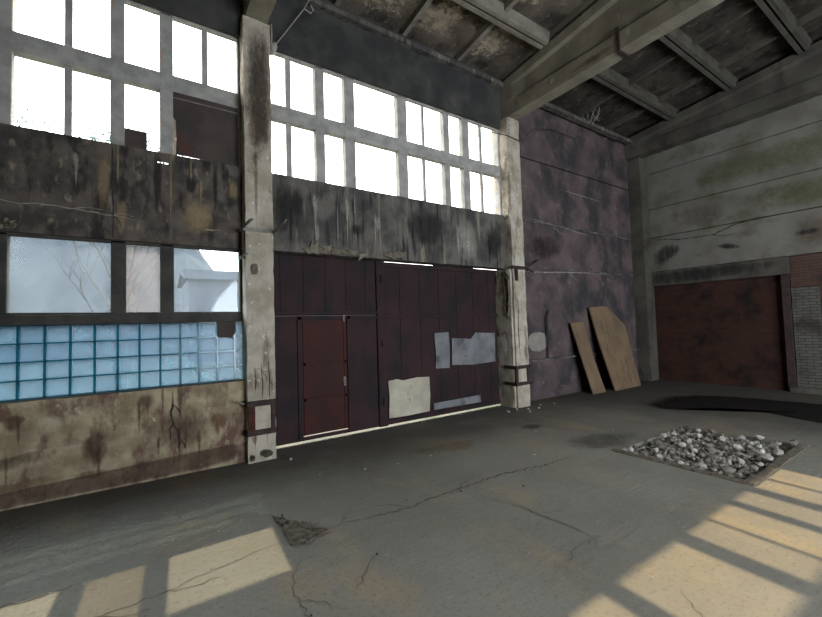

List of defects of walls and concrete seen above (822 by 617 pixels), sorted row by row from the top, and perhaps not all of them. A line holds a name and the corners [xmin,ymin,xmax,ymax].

water stain [0,422,237,509]
crack [331,453,597,572]
crack [0,582,81,608]
crack [97,538,288,617]
crack [291,566,337,617]